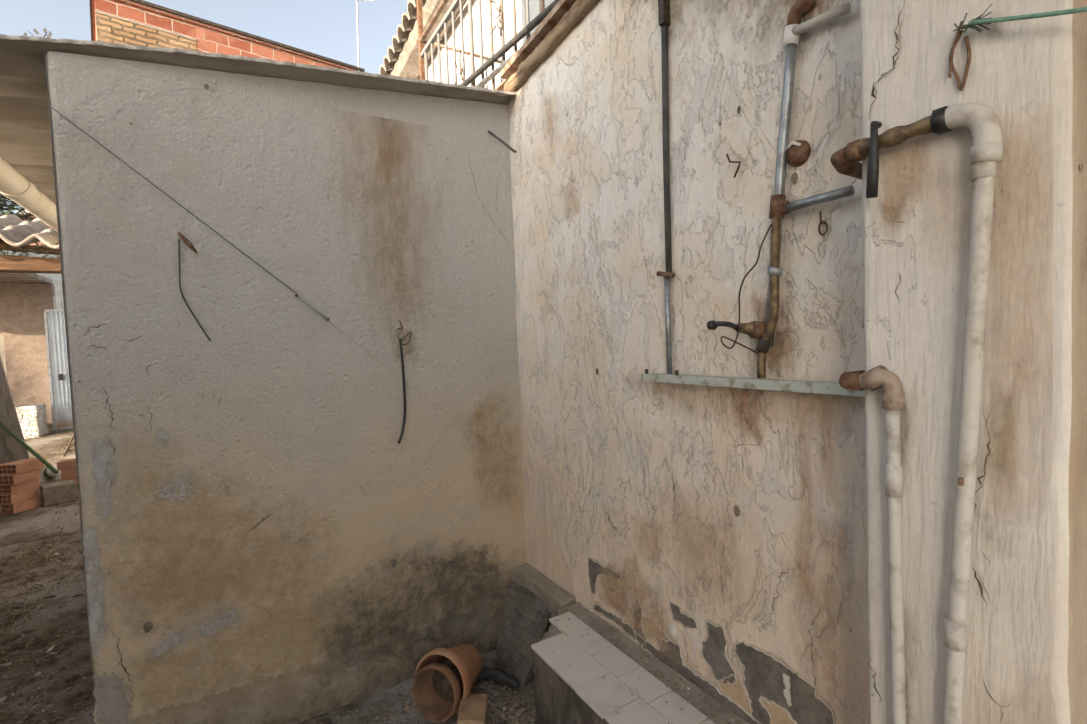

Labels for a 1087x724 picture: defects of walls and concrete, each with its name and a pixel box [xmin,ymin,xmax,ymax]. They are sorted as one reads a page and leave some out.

crack [869,0,908,120]
crack [710,408,757,501]
crack [628,462,676,565]
spalling [588,557,836,724]
crack [766,567,790,627]